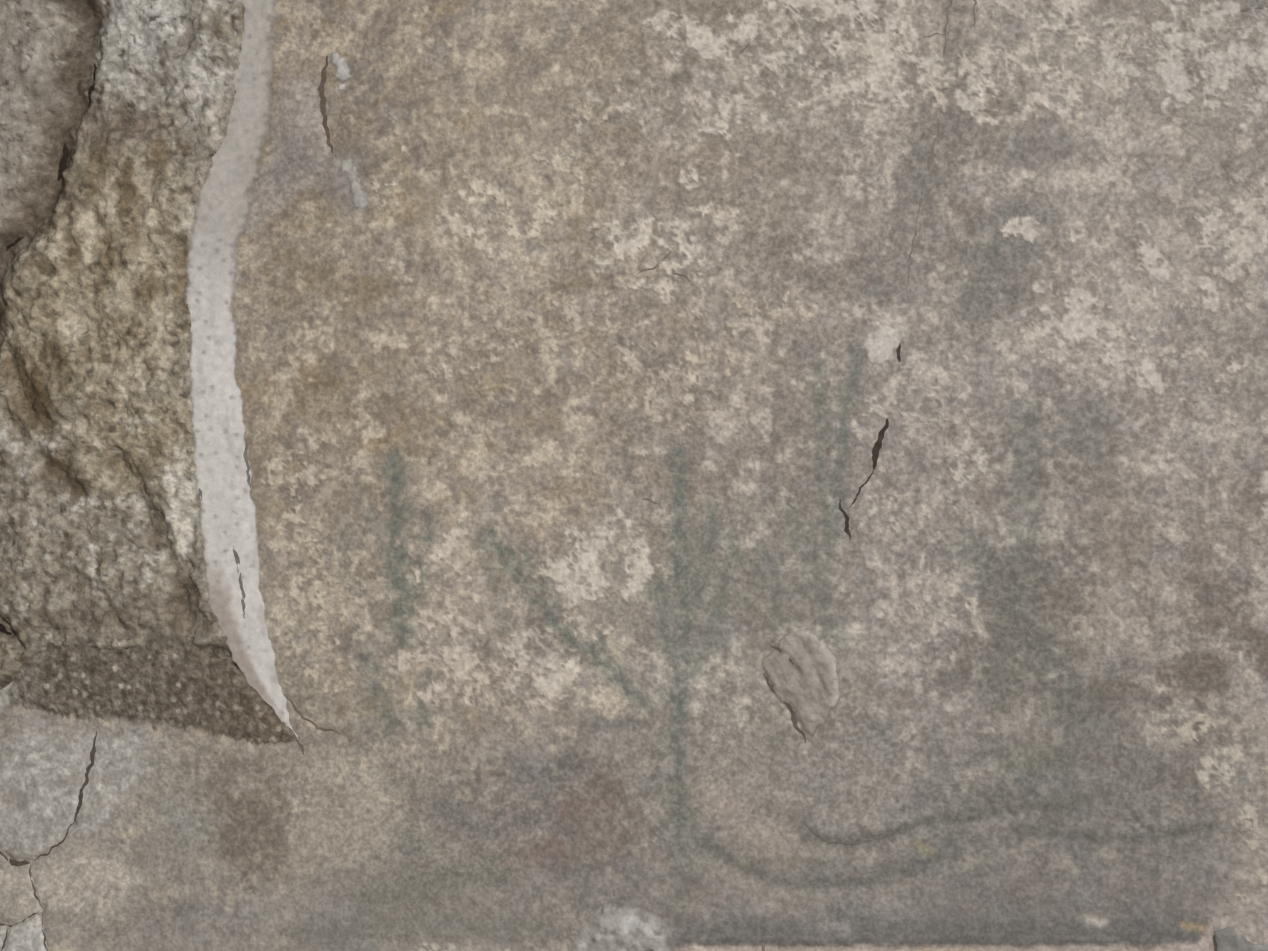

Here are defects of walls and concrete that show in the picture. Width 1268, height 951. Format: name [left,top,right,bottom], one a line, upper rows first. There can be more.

spalling [0,0,245,695]
crack [894,343,902,362]
crack [839,418,889,540]
spalling [0,713,157,925]